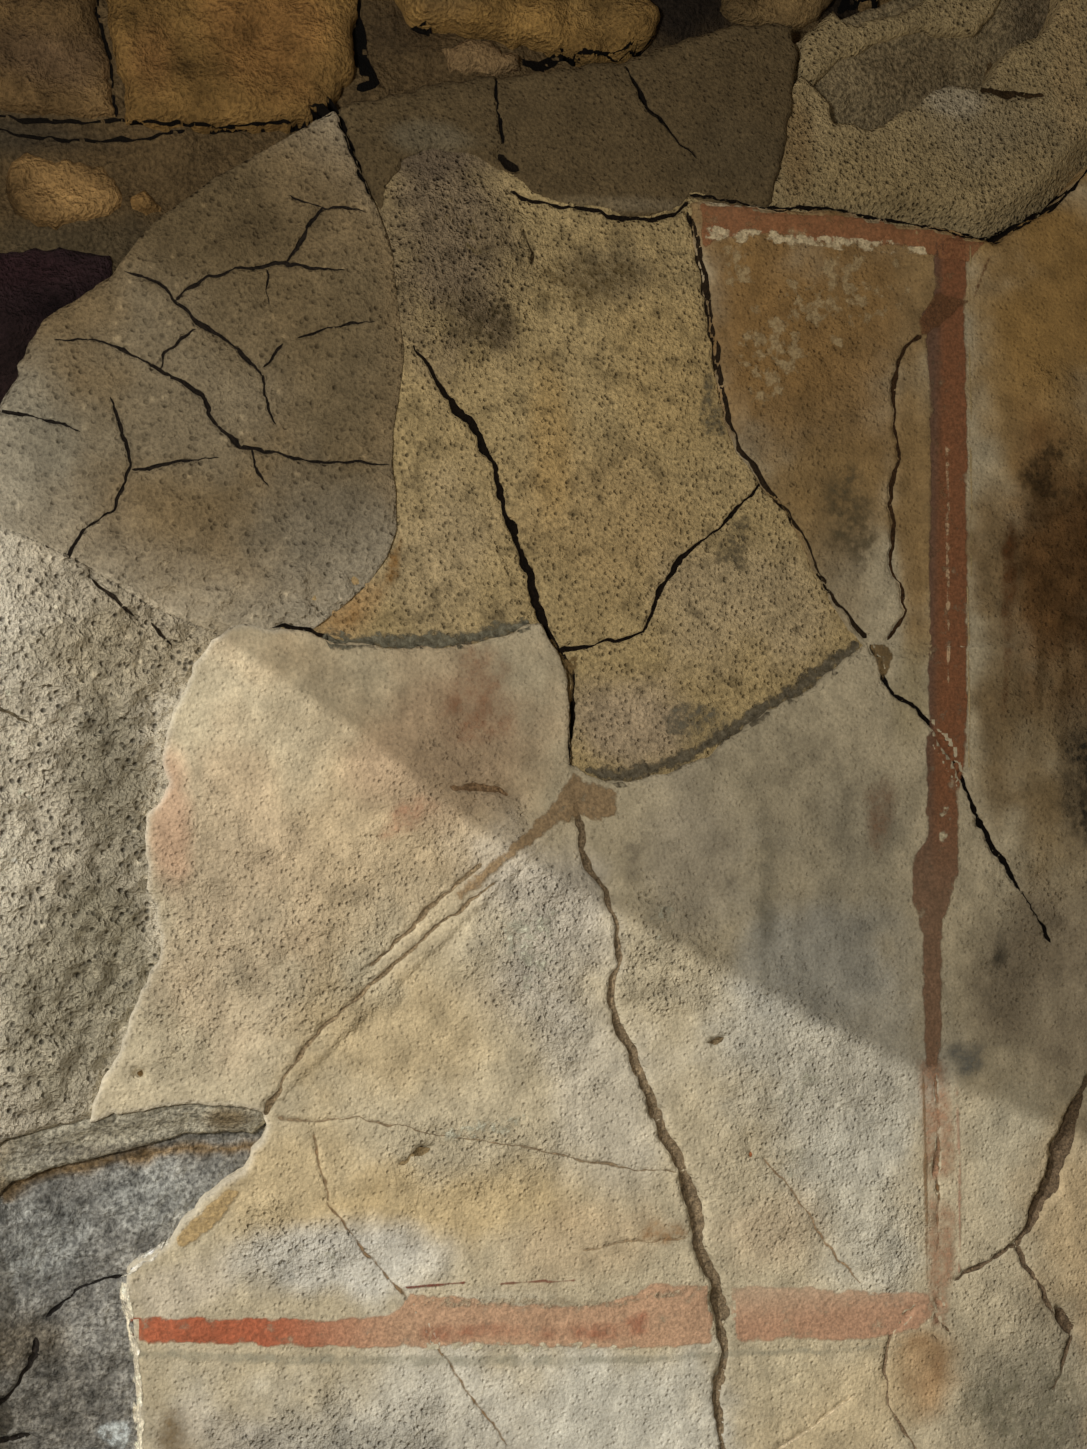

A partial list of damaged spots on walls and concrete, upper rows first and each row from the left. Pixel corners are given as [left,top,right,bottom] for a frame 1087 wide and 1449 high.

crack [411,21,432,36]
crack [494,30,697,159]
crack [0,0,389,646]
spalling [0,0,1087,788]
crack [413,168,1087,943]
spalling [0,1104,266,1449]
crack [264,813,730,1449]
crack [763,1158,860,1283]
crack [882,1328,917,1449]
crack [954,1075,1087,1390]